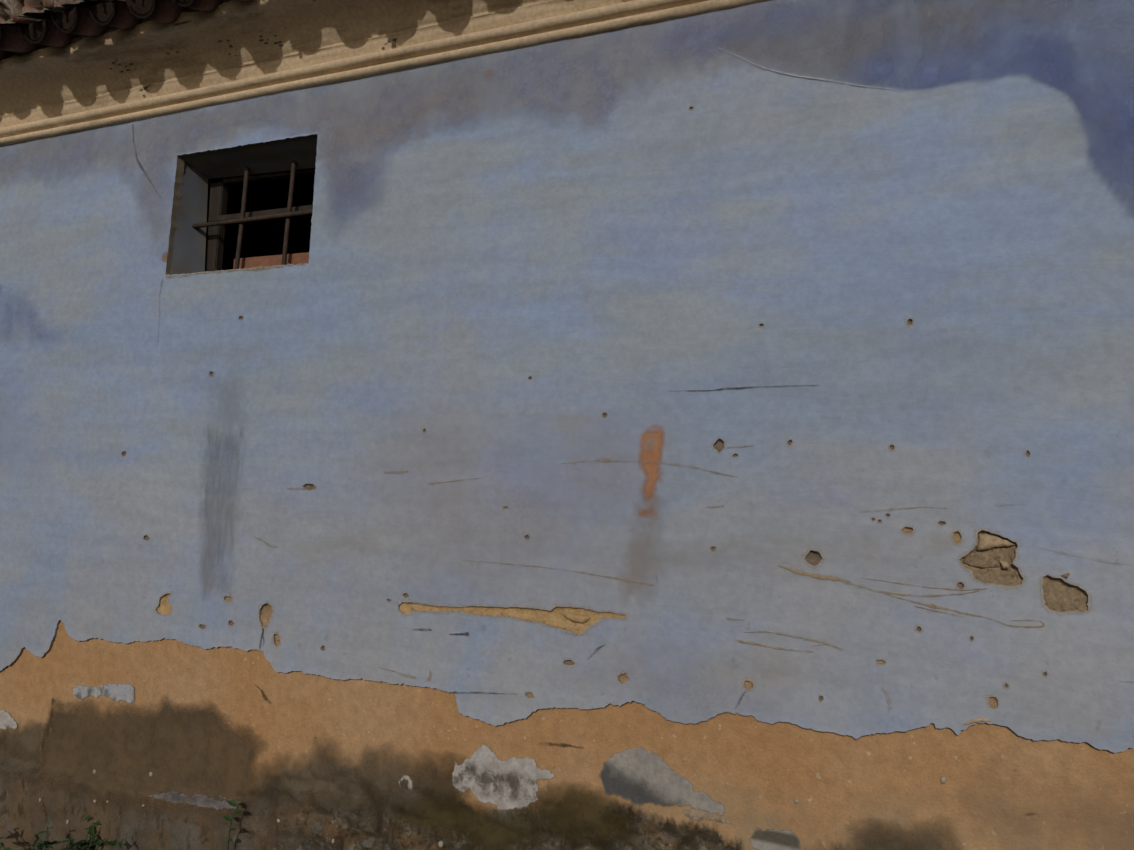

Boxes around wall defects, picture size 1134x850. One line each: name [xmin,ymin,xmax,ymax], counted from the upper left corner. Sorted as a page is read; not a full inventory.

rust [640,430,663,514]
spalling [938,521,1025,589]
spalling [1041,573,1090,613]
spalling [258,603,280,646]
spalling [988,684,1009,709]